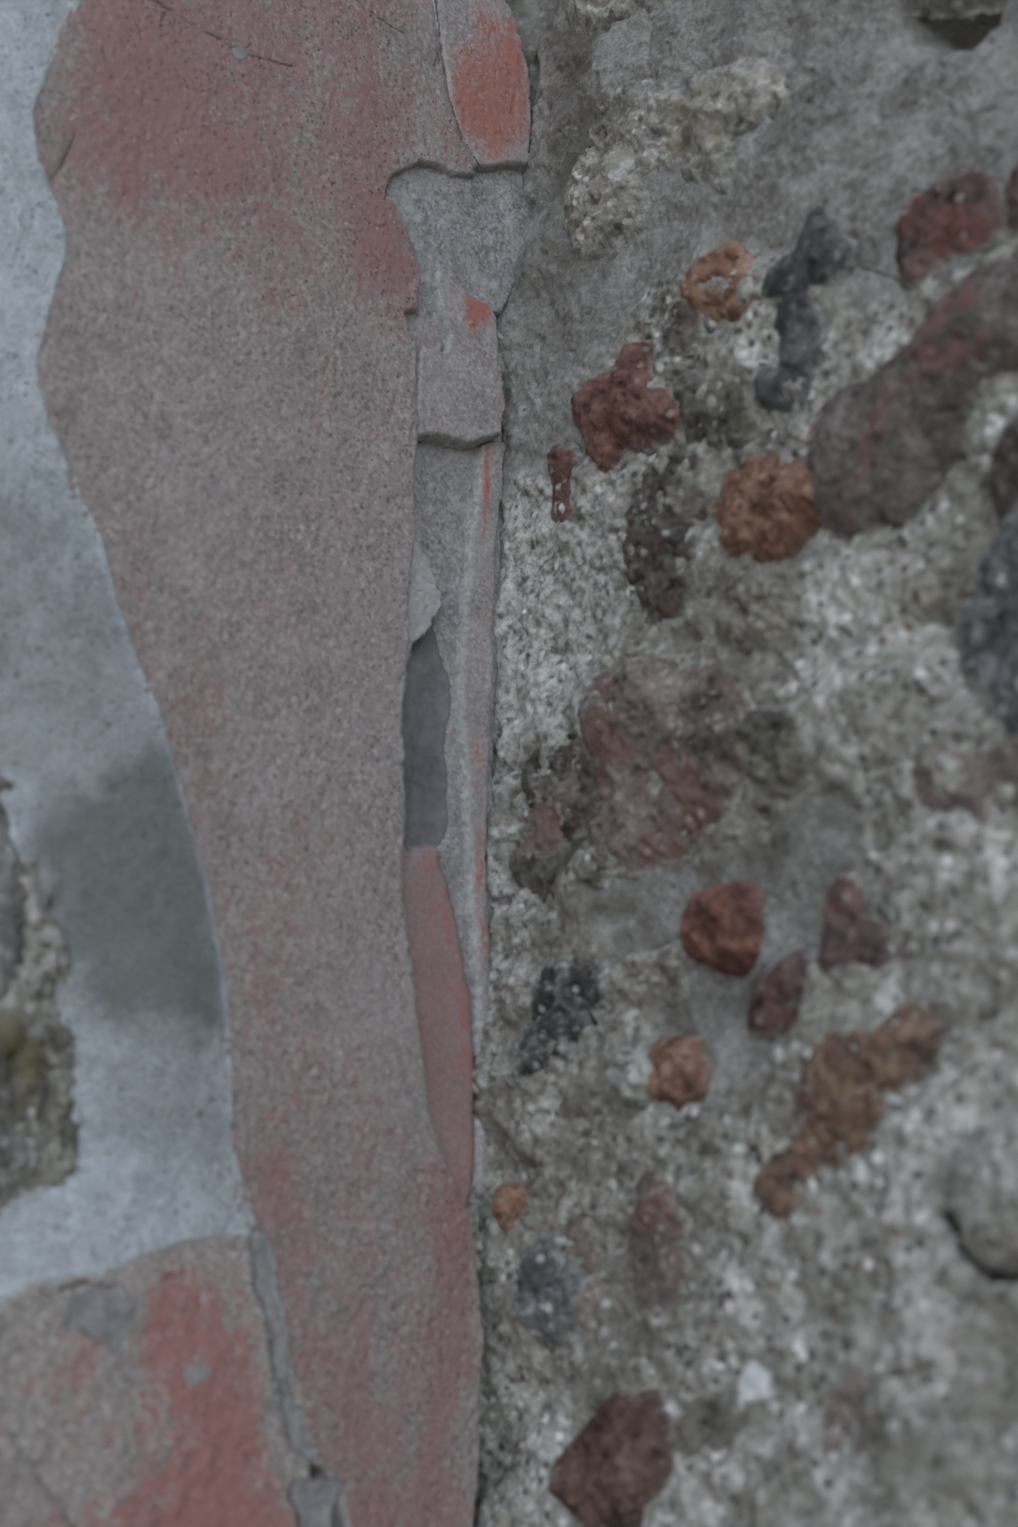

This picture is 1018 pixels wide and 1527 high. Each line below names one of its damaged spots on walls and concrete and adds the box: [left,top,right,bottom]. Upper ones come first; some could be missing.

crack [357,0,481,168]
spalling [386,166,530,355]
spalling [401,430,506,1207]
crack [249,1226,319,1458]